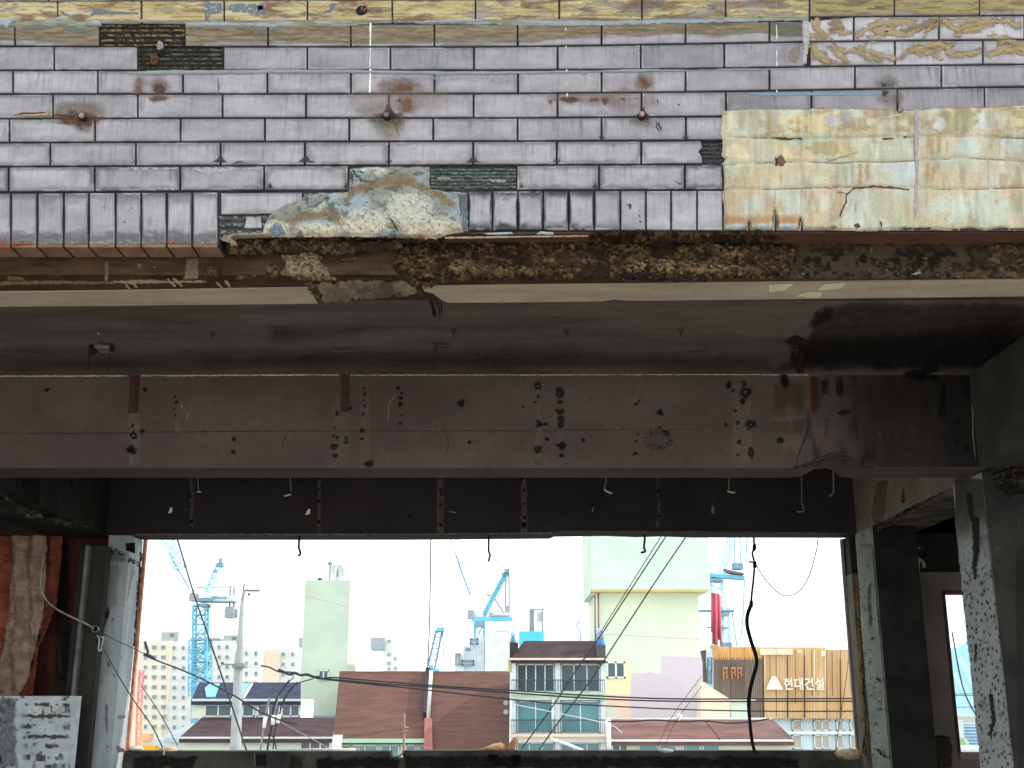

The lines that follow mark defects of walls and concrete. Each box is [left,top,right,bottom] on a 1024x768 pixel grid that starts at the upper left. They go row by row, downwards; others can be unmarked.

peeling [89,2,286,69]
rust [44,104,97,124]
rust [135,81,166,101]
rust [371,80,414,124]
rust [549,97,614,105]
peeling [219,105,1024,303]
crack [825,185,909,217]
rust [784,335,828,412]
damp [782,305,1023,467]
spalling [992,467,1024,497]